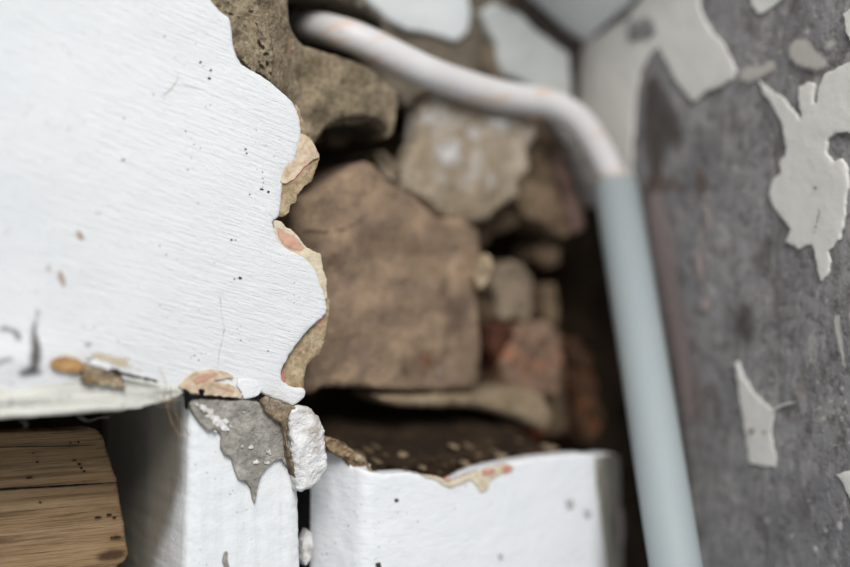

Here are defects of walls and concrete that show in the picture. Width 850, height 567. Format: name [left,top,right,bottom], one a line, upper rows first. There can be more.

peeling [751,0,782,15]
peeling [759,62,850,281]
spalling [178,0,737,567]
peeling [735,361,796,467]
peeling [837,471,850,498]